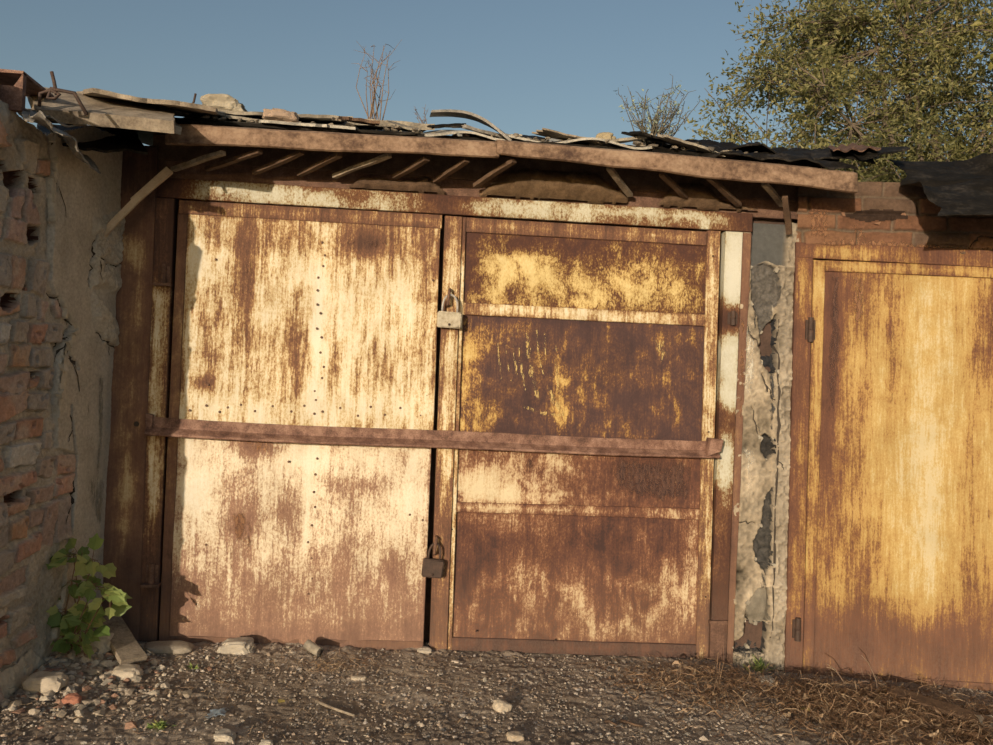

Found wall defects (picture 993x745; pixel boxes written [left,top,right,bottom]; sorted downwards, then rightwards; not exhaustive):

spalling [751,263,782,374]
spalling [758,434,776,460]
spalling [753,488,777,570]
spalling [732,587,771,652]